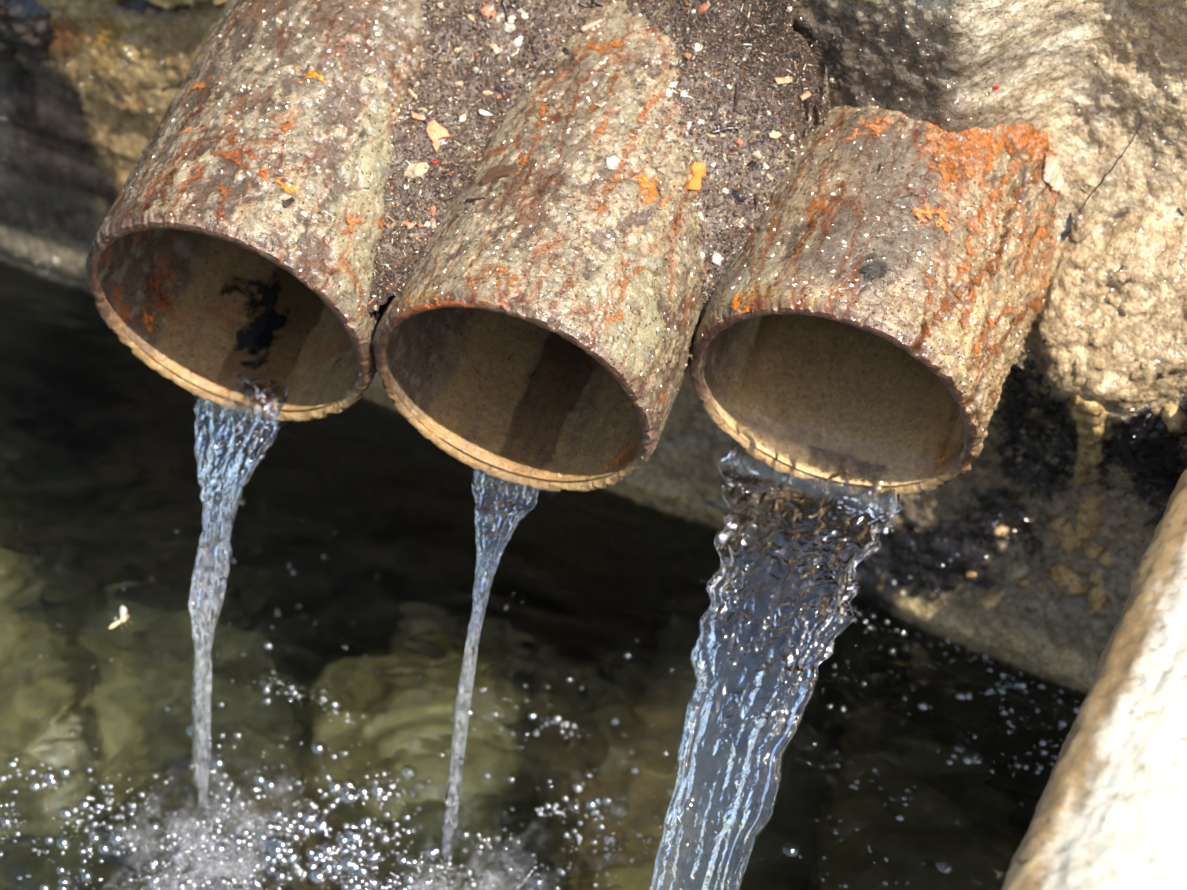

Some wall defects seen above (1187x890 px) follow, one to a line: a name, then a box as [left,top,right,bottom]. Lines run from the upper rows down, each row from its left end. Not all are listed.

water stain [0,58,118,244]
rust [141,77,299,218]
rust [566,73,619,144]
rust [592,90,668,213]
rust [836,117,894,142]
rust [550,277,575,309]
rust [603,266,648,330]
rust [731,293,752,313]
rust [734,163,845,276]
rust [911,121,1060,372]
water stain [753,337,1081,615]
water stain [1089,391,1187,538]